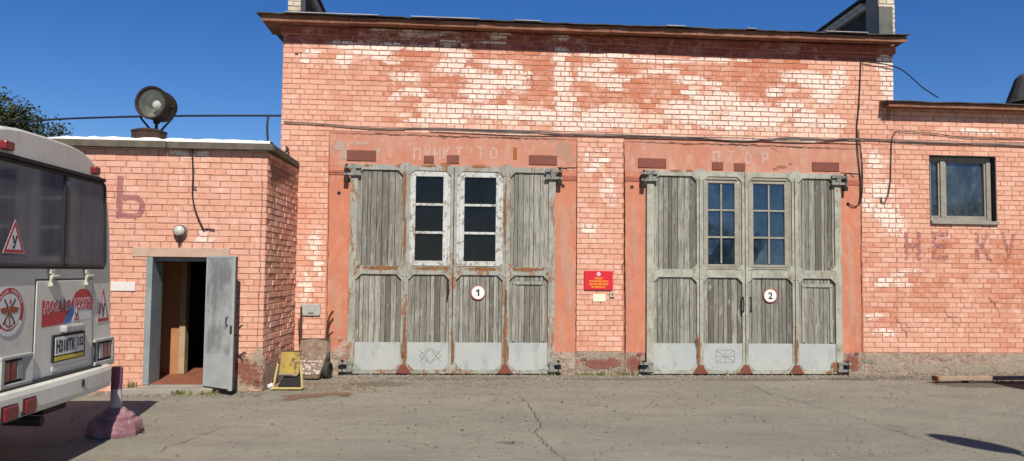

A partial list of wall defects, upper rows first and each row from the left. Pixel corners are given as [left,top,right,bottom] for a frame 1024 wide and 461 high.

peeling [299,28,849,132]
corrosion [356,164,407,270]
spalling [234,347,290,392]
spalling [559,350,645,372]